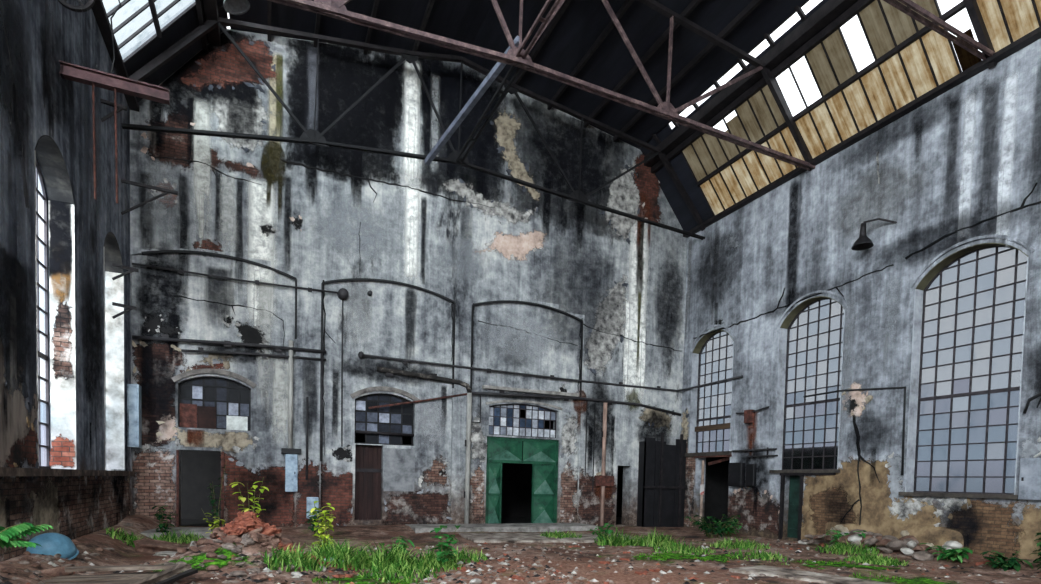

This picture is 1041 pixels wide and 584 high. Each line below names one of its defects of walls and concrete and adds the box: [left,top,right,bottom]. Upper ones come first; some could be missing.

flaking render [141,112,196,209]
flaking render [192,236,226,259]
flaking render [181,37,277,180]
water stain [326,177,383,254]
water stain [391,62,439,276]
flaking render [443,107,547,261]
rust [637,195,650,242]
flaking render [0,301,353,561]
flaking render [469,411,487,524]
flaking render [560,409,617,526]
flaking render [801,452,1041,560]